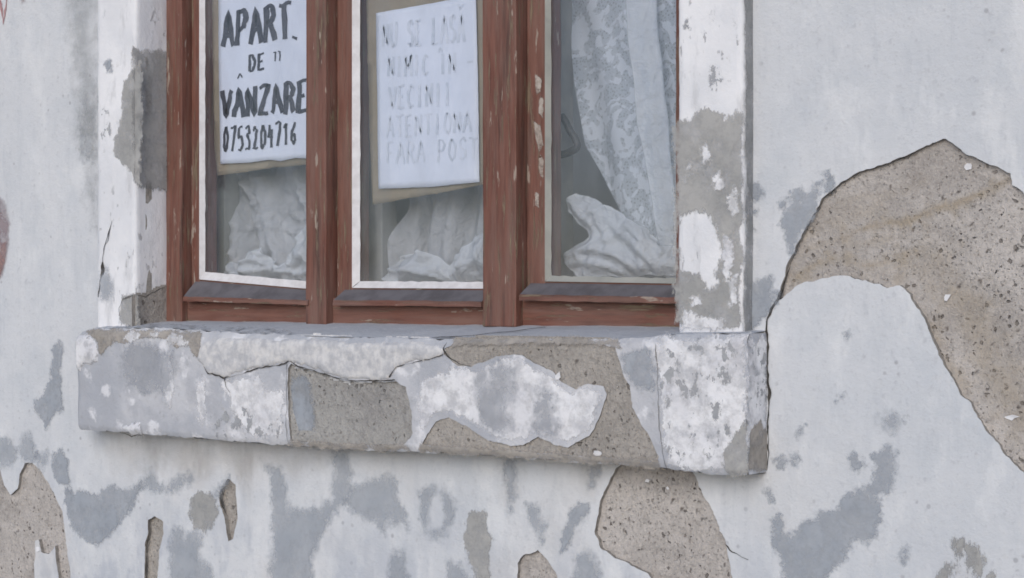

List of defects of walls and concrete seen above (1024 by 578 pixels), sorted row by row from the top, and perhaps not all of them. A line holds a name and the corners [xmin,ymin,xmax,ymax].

peeling [101,46,167,191]
crack [98,222,112,299]
spalling [87,285,205,409]
peeling [196,377,206,425]
crack [204,327,543,441]
spalling [215,0,1024,578]
spalling [0,433,238,578]